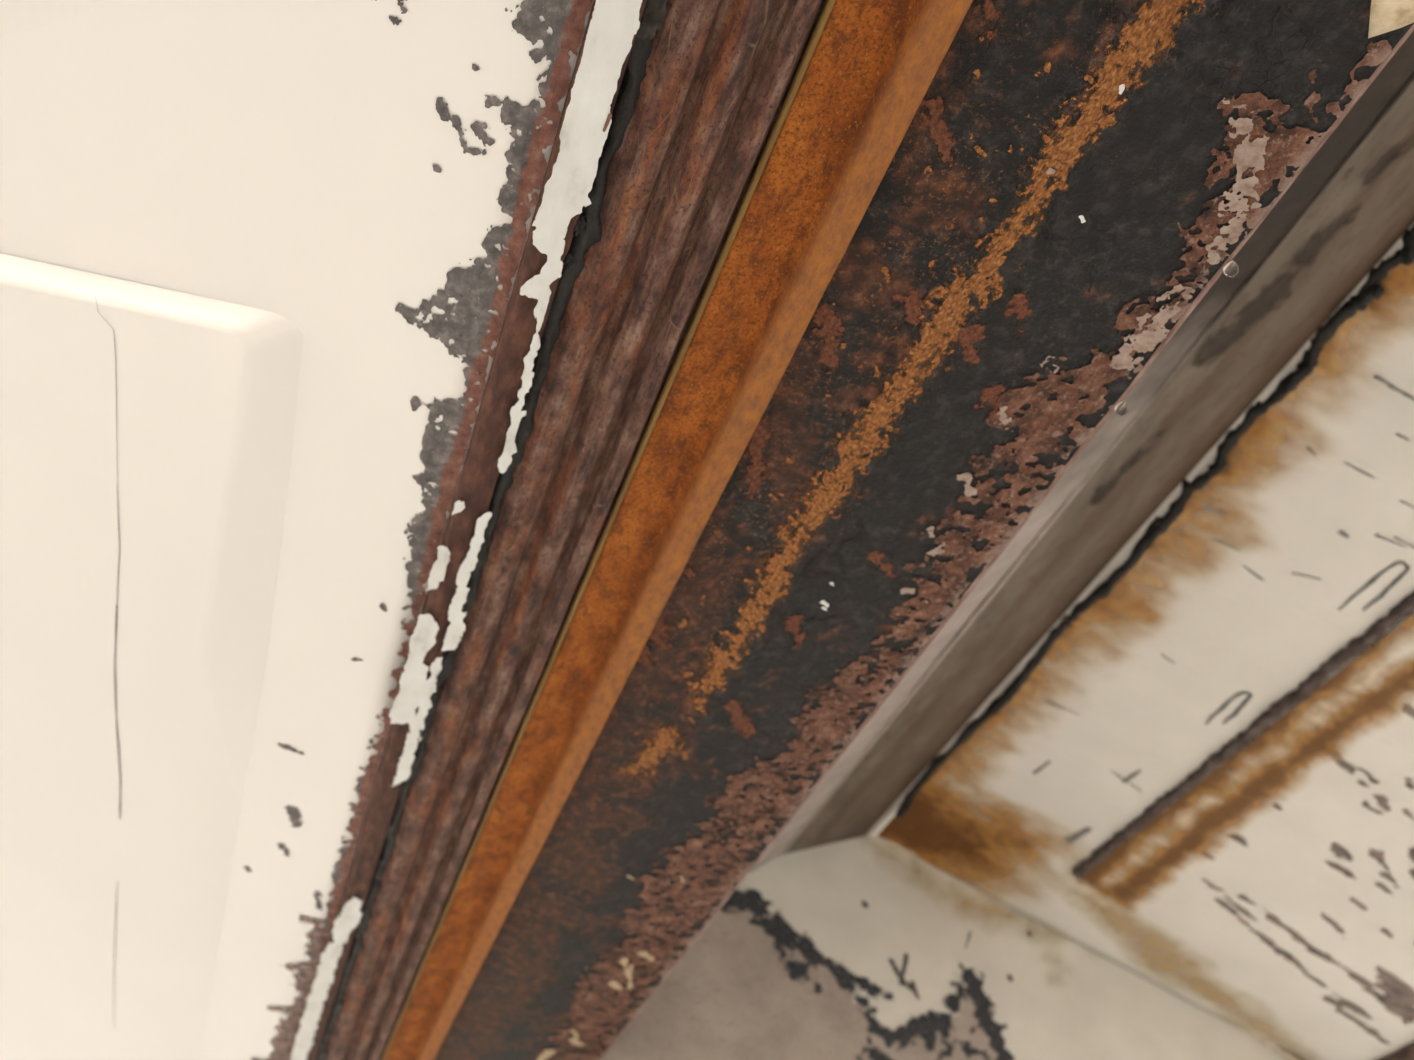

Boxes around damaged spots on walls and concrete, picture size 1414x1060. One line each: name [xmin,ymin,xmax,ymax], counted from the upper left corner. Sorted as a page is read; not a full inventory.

crack [95,296,117,433]
crack [112,880,120,1002]
crack [113,476,121,819]
peeling [251,0,643,1060]
rust [610,0,1217,779]
peeling [536,40,1414,1060]
rust [878,261,1414,890]
rust [1076,614,1414,1036]